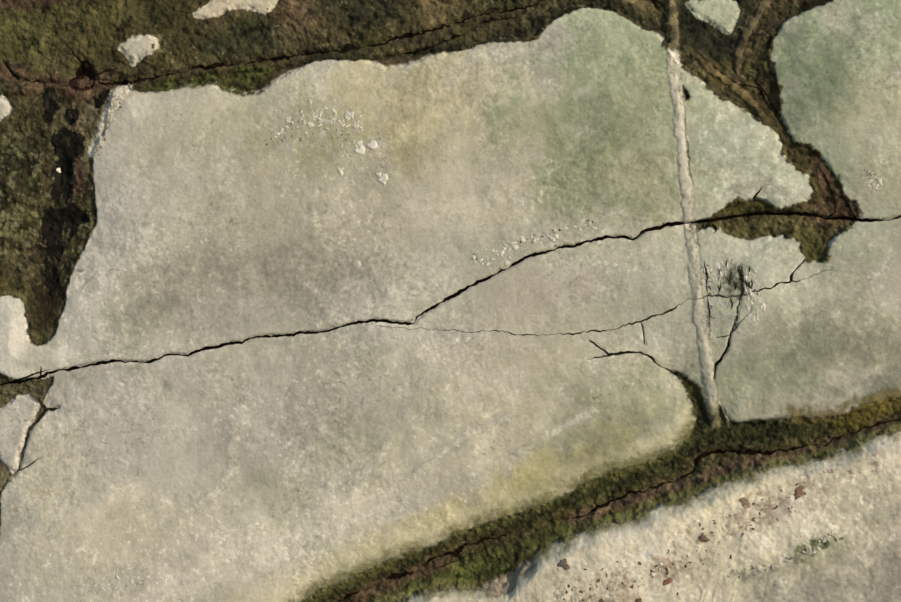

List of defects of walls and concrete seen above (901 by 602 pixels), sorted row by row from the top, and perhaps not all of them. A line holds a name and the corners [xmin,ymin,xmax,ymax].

crack [3,0,544,87]
crack [0,163,901,385]